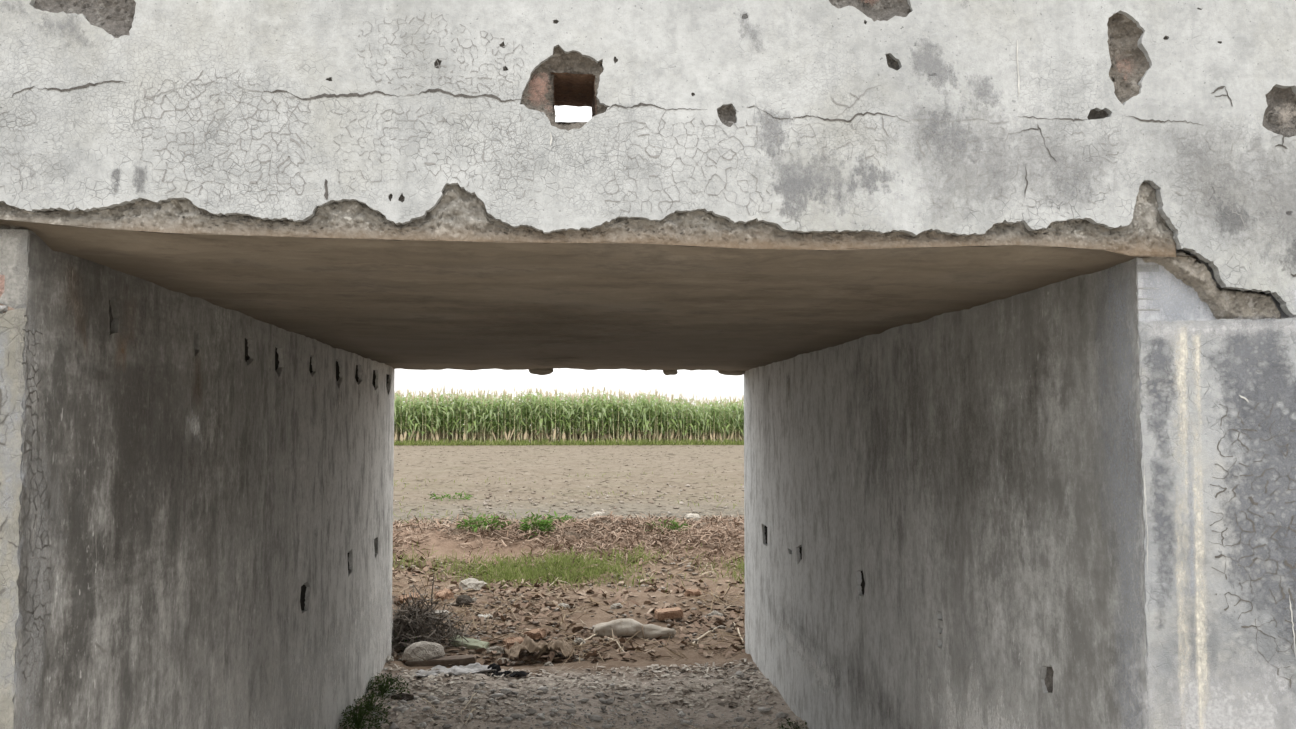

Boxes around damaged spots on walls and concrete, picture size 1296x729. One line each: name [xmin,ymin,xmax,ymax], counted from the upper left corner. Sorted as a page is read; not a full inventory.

spalling [33,0,136,38]
crack [0,12,540,206]
spalling [520,46,618,131]
spalling [829,0,912,24]
crack [603,85,1296,227]
spalling [1107,12,1150,104]
spalling [1262,86,1296,137]
spalling [0,182,1281,320]
damp [1147,270,1262,430]
crack [0,315,53,683]
damp [1175,482,1287,729]
crack [1209,403,1296,688]